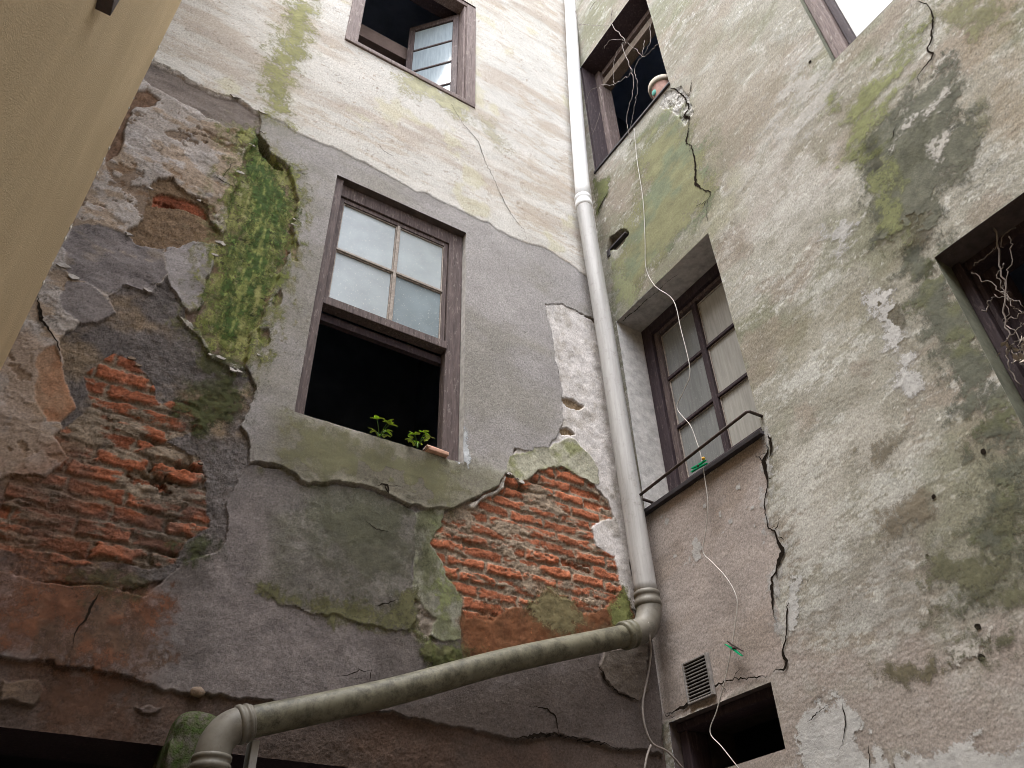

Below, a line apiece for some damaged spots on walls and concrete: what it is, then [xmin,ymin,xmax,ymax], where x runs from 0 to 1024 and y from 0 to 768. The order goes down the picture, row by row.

crack [917,1,934,83]
crack [671,80,711,221]
damp [866,86,954,244]
peeling [0,61,283,590]
spalling [423,444,449,458]
spalling [430,303,636,620]
crack [714,435,789,692]
crack [664,703,688,718]
peeling [794,687,1024,768]